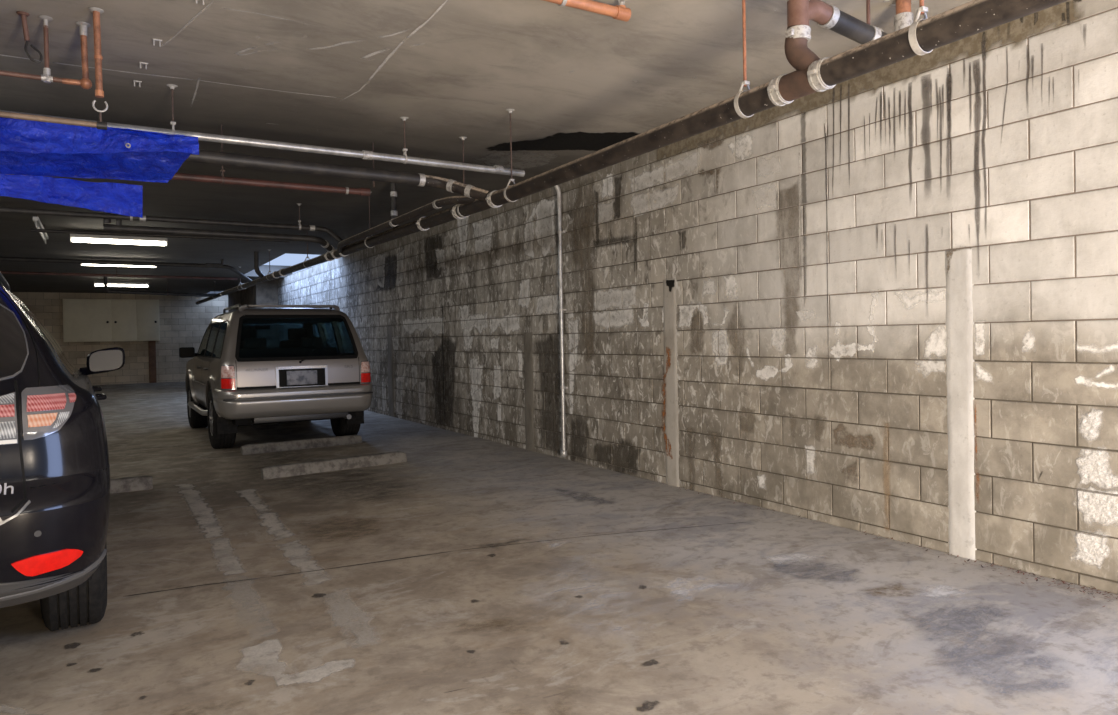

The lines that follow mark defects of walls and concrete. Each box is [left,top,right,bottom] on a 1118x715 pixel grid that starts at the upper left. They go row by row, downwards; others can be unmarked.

crack [0,0,448,102]
spalling [475,132,638,169]
damp [382,0,1085,474]
rust [662,347,672,458]